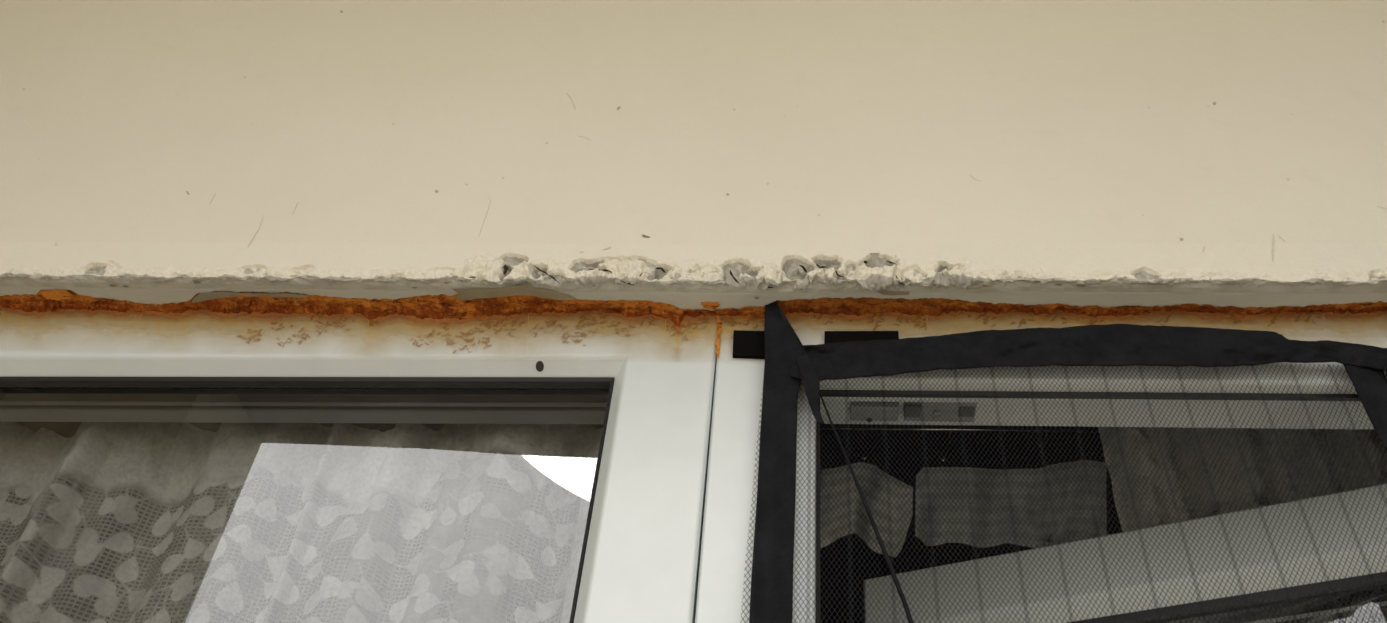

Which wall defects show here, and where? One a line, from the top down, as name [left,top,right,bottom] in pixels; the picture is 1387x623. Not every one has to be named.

peeling [0,242,1387,303]
rust [0,289,1387,358]